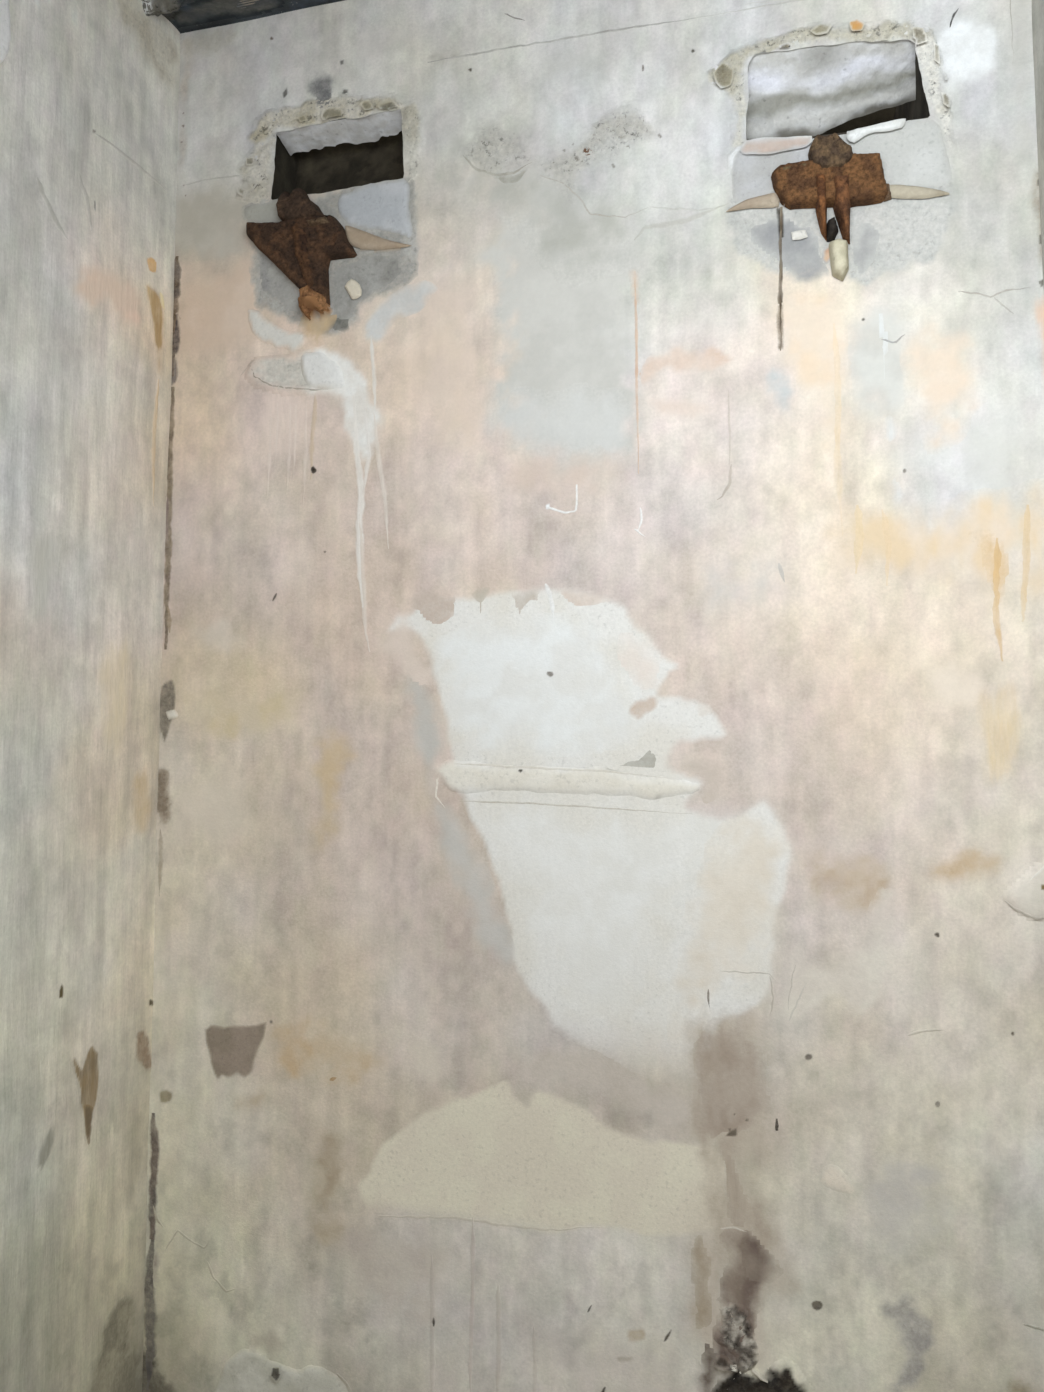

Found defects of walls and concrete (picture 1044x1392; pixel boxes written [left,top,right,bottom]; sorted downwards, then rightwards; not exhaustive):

spalling [235,89,438,397]
spalling [704,16,965,295]
leakage [847,0,1044,499]
efflorescence [257,336,391,652]
peeling [407,581,808,1089]
peeling [204,1019,277,1119]
spalling [271,1367,281,1382]
peeling [356,1079,701,1238]
leakage [742,1243,784,1284]